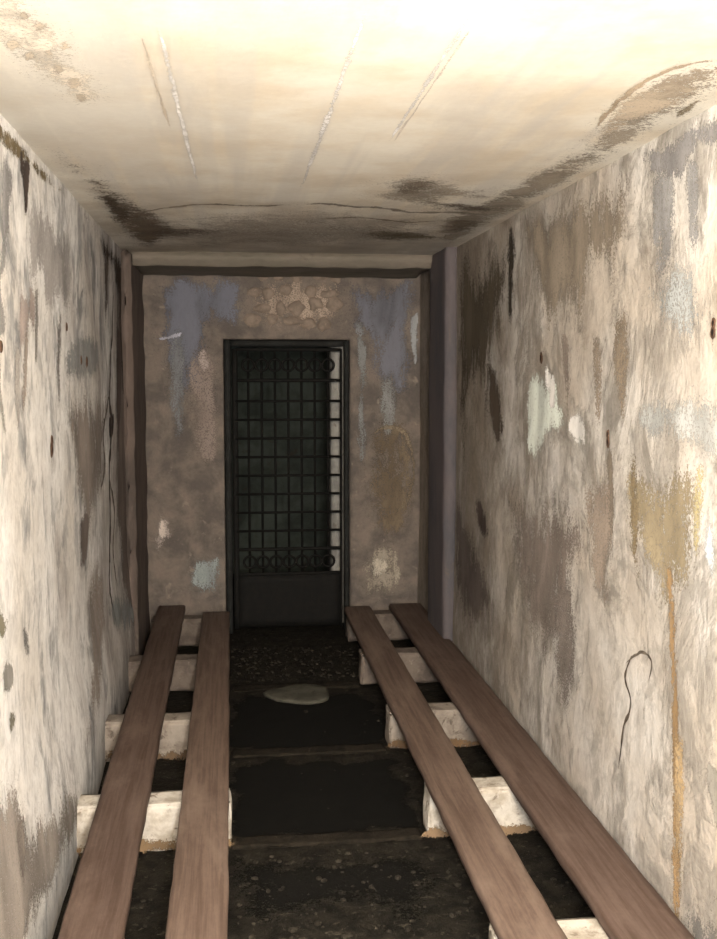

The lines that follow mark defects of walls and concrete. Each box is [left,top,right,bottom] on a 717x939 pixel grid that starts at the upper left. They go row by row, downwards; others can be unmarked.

spalling [0,0,98,105]
water stain [0,118,75,428]
water stain [104,194,129,219]
water stain [142,176,496,252]
water stain [56,229,134,734]
crack [618,650,652,769]
corrosion [625,456,706,918]